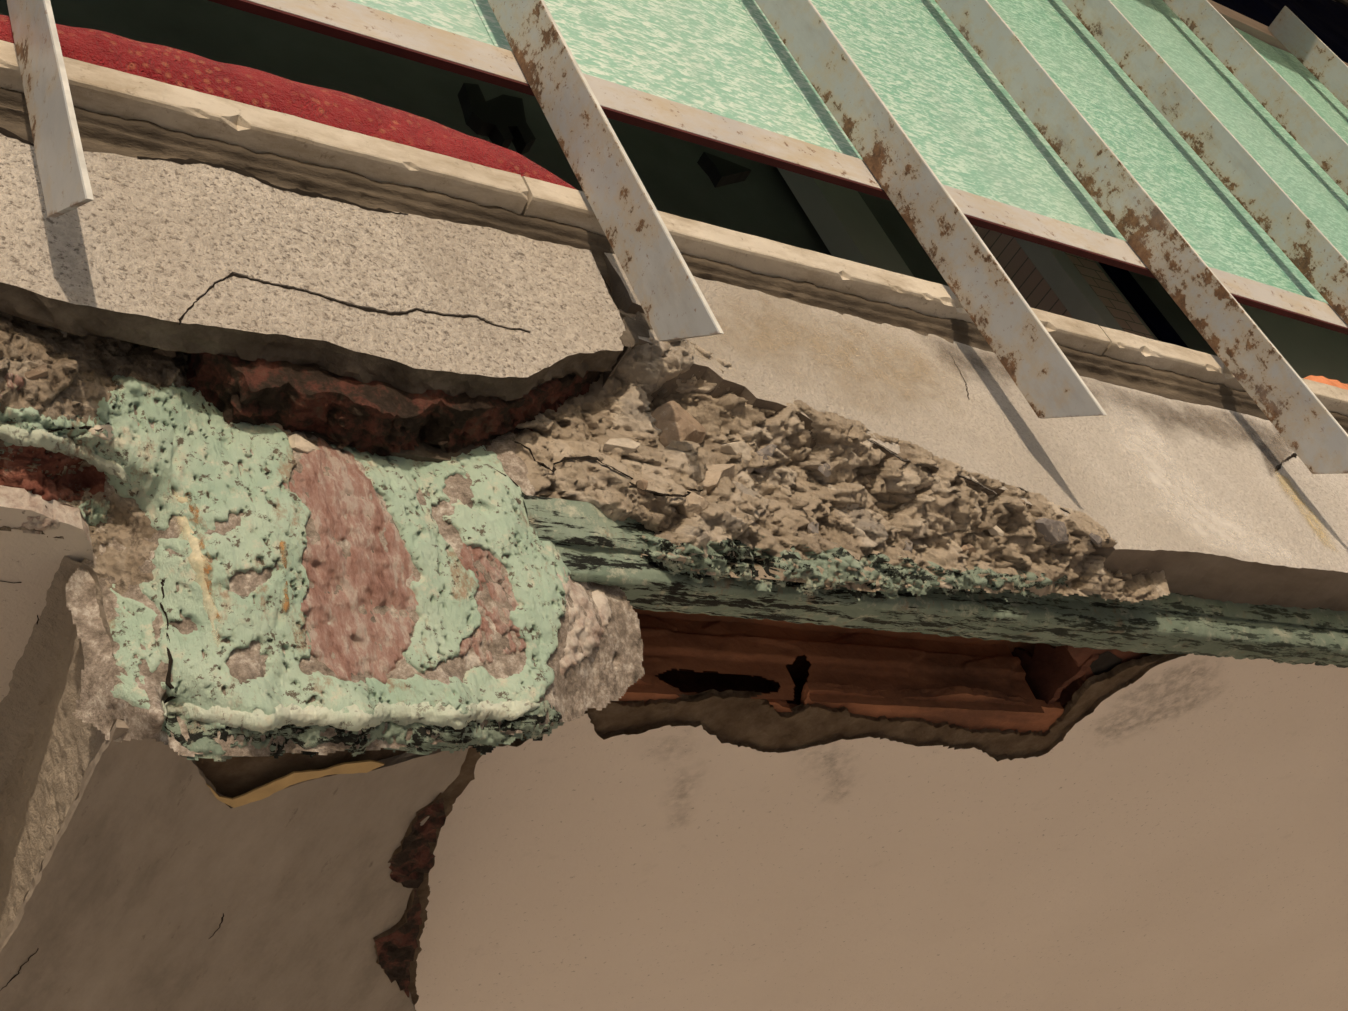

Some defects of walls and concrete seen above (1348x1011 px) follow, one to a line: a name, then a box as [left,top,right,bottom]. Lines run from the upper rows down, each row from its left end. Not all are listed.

crack [178,272,530,333]
peeling [0,313,1171,808]
flaking render [373,792,446,997]